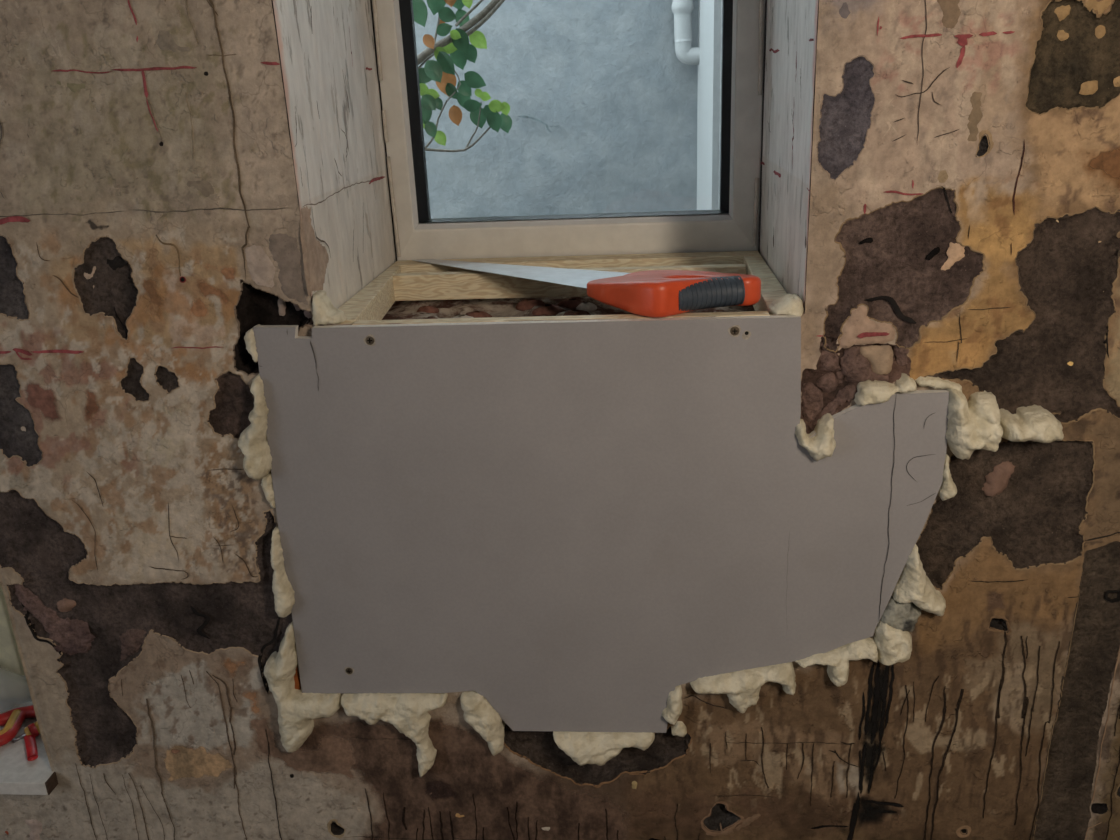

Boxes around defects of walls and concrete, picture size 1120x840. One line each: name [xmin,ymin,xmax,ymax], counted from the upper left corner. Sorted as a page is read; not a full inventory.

crack [207,0,250,276]
flaking render [207,279,313,440]
flaking render [800,170,986,434]
flaking render [924,206,1120,424]
flaking render [916,439,1096,590]
flaking render [0,488,293,769]
water stain [250,718,627,840]
flaking render [502,720,692,789]
water stain [786,743,814,806]
water stain [811,662,964,840]
water stain [983,592,1007,818]
water stain [1014,636,1060,840]